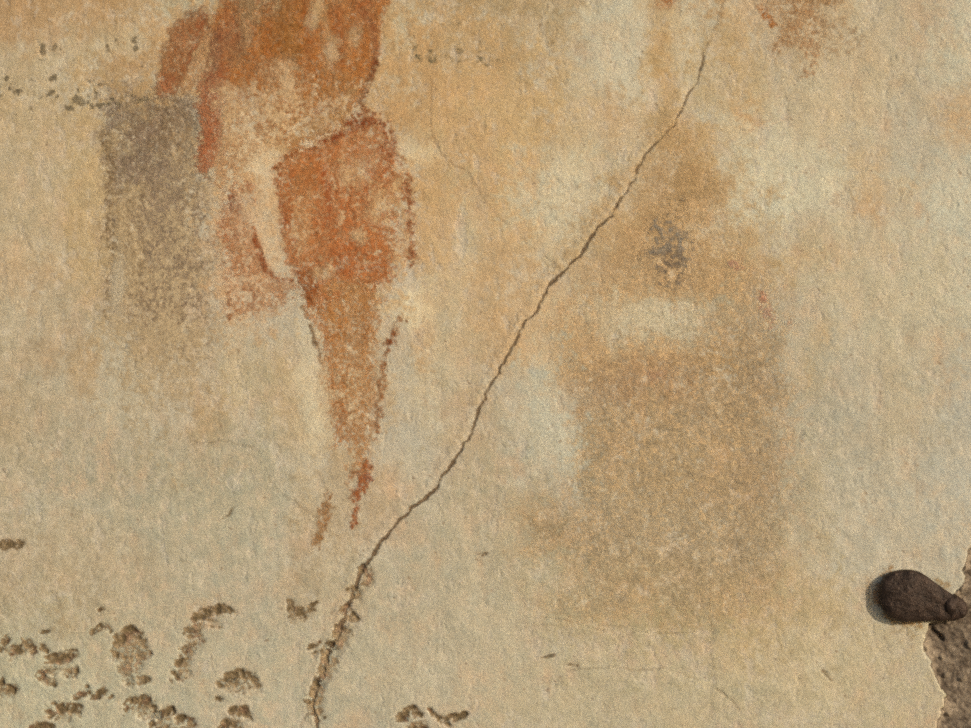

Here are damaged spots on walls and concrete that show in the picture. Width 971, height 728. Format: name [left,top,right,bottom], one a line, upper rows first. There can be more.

crack [303,55,704,728]
spalling [0,539,25,551]
spalling [0,677,18,695]
spalling [0,630,79,687]
spalling [29,684,113,728]
spalling [89,607,196,728]
spalling [169,603,236,682]
spalling [215,668,262,728]
spalling [287,599,319,623]
spalling [396,705,468,728]
flaking render [923,548,971,728]